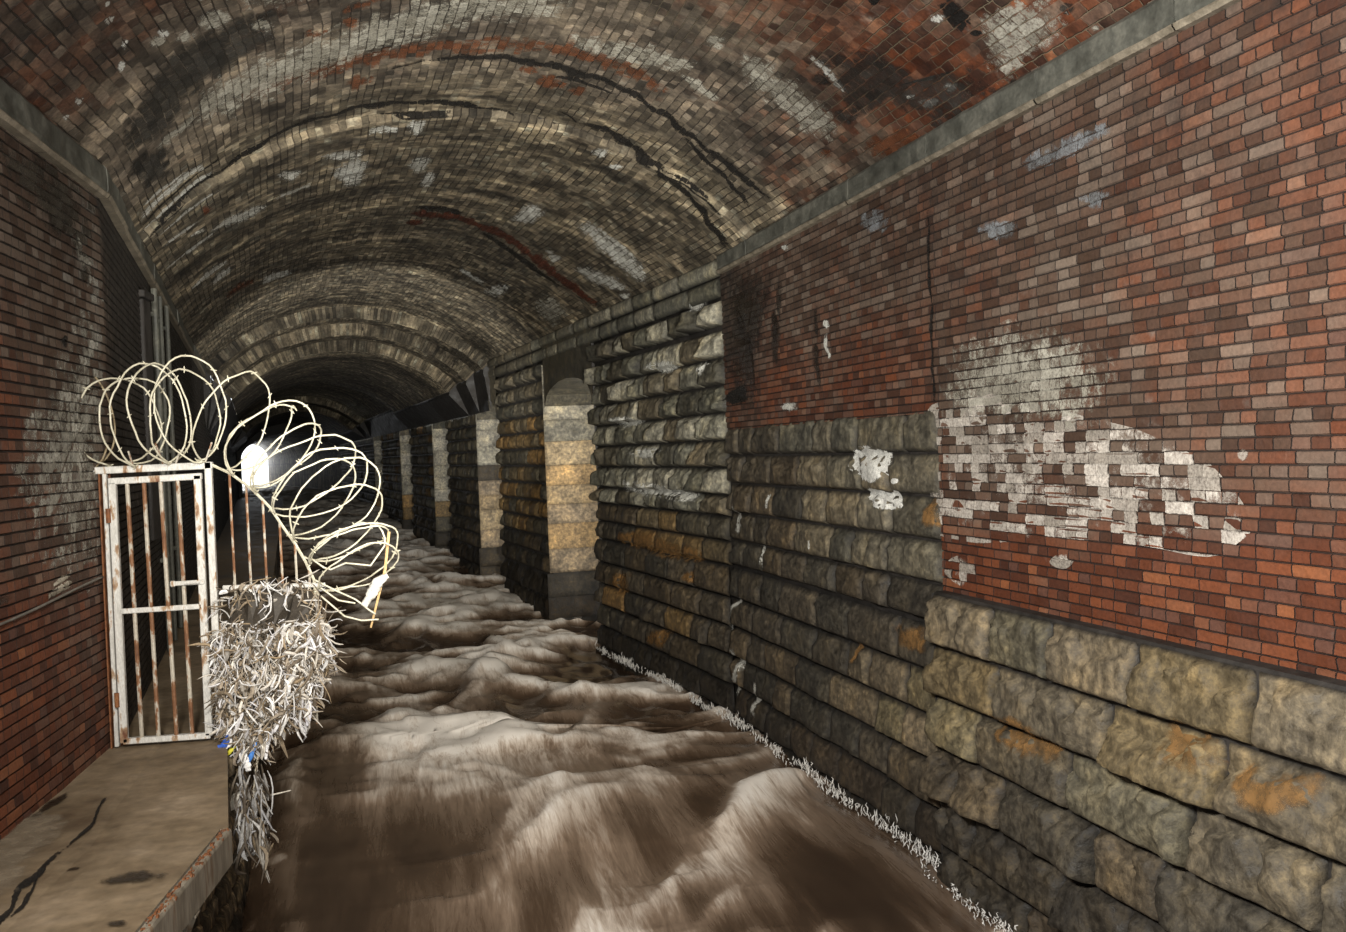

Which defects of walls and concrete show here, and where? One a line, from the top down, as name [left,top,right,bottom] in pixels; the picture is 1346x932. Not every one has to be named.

rust [238,36,667,100]
damp [707,36,724,50]
damp [741,56,837,141]
damp [810,55,844,92]
crack [142,54,770,249]
damp [15,238,102,572]
damp [928,322,1250,557]
damp [944,556,975,585]
damp [1050,555,1073,569]